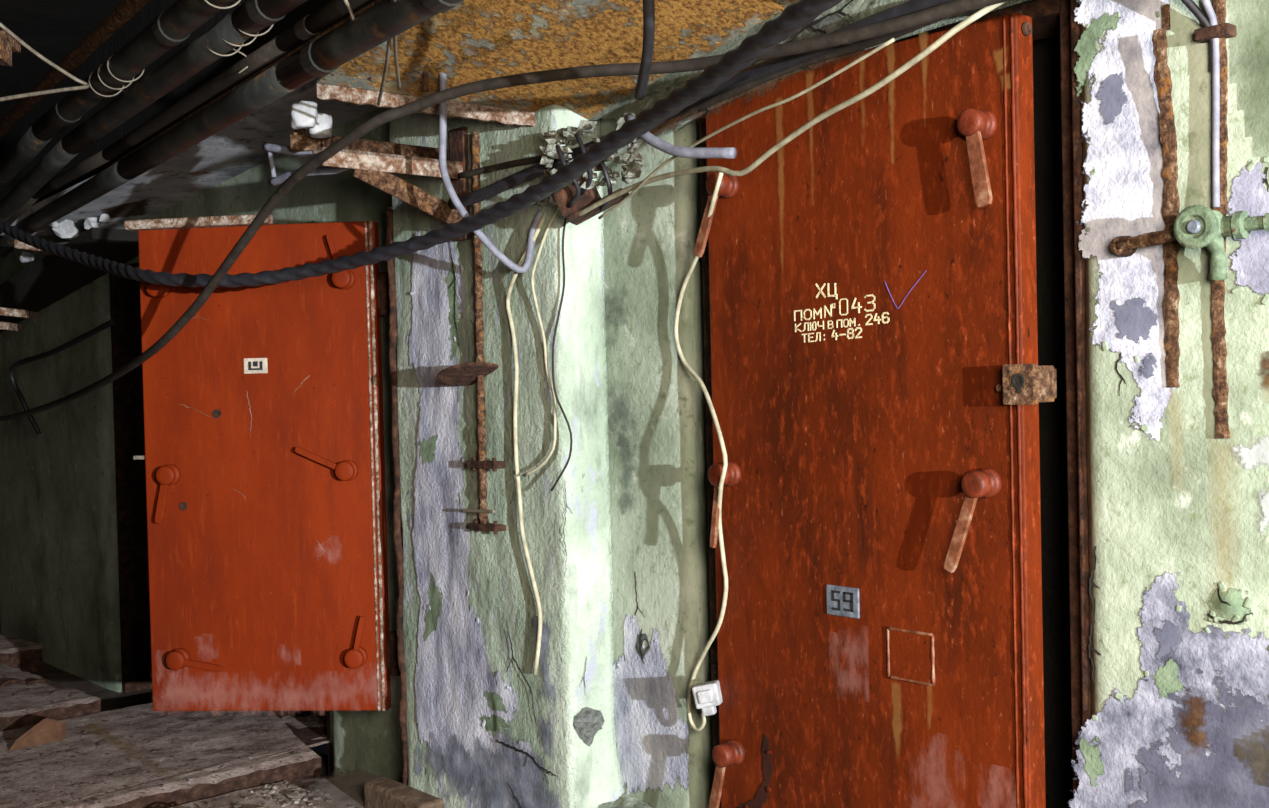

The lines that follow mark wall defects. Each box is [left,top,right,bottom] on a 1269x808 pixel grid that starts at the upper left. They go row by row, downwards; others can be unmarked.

rust [340,0,792,115]
rust [636,42,865,144]
rust [1213,0,1228,216]
peeling [1074,0,1180,441]
rust [1152,28,1180,387]
peeling [1227,156,1269,305]
rust [1211,280,1230,438]
peeling [407,226,534,776]
peeling [1232,436,1269,469]
peeling [1259,491,1269,532]
peeling [573,614,690,795]
peeling [1069,571,1269,808]